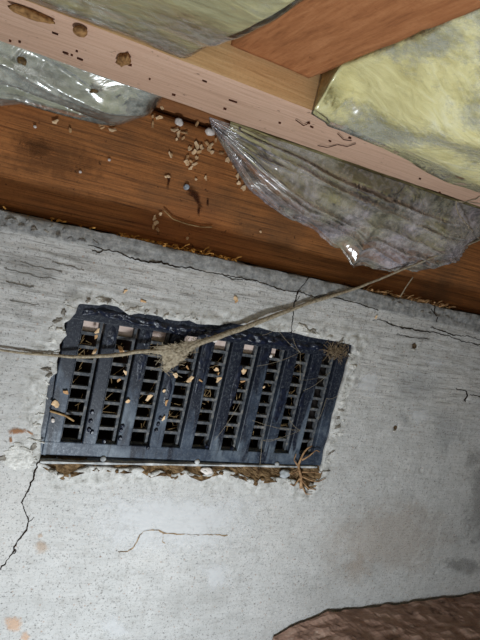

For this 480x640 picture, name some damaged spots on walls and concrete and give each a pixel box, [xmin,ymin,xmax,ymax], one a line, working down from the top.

crack [88,245,480,345]
crack [0,462,39,570]